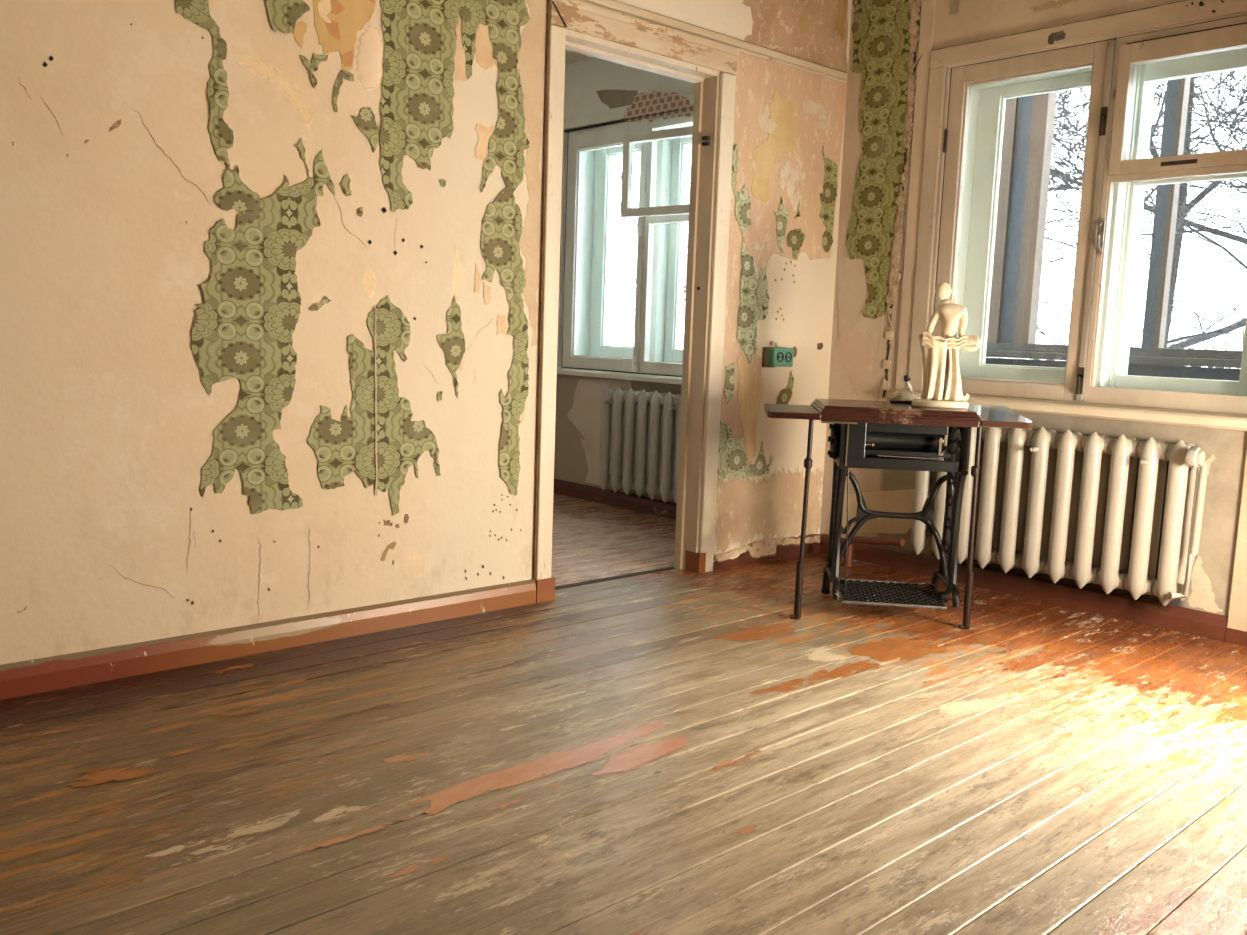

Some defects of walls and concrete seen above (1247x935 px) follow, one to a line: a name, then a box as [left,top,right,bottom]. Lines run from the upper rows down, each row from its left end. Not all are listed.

flaking render [597,90,638,109]
crack [136,111,211,206]
peeling [885,0,921,340]
flaking render [720,0,848,464]
spalling [717,536,820,561]
flaking render [841,489,914,537]